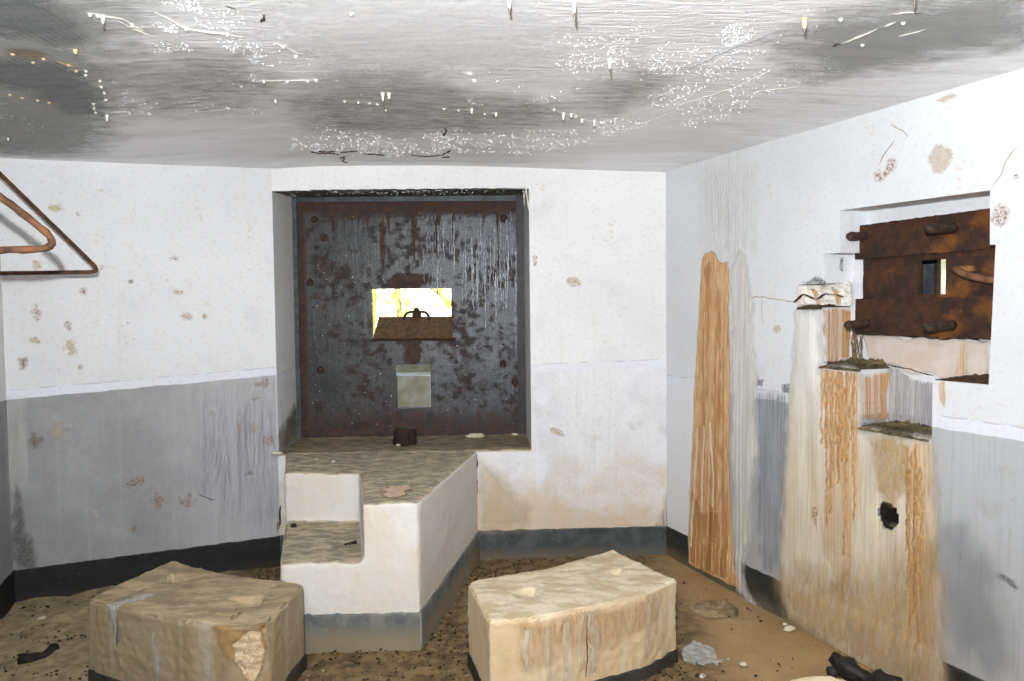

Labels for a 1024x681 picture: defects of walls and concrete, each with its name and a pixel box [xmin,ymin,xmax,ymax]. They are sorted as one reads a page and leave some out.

leakage [0,0,112,155]
leakage [283,0,555,130]
leakage [800,0,1024,73]
spalling [794,259,852,307]
rust [688,251,738,588]
leakage [729,253,785,605]
rust [812,309,890,599]